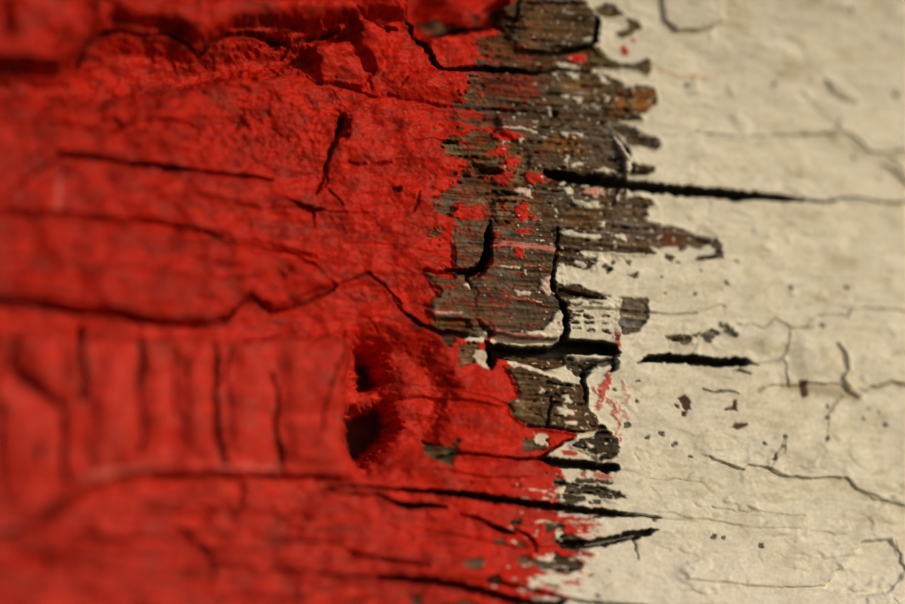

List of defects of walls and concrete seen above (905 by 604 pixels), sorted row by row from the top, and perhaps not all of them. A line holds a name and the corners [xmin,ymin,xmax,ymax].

crack [73,0,602,110]
peeling [421,0,727,367]
crack [0,115,905,525]
peeling [665,323,742,347]
peeling [504,356,621,463]
crack [168,480,345,604]
peeling [421,438,462,469]
crack [267,554,644,604]
crack [325,484,663,562]
peeling [494,515,594,581]
peeling [549,477,625,505]
crack [783,537,905,590]